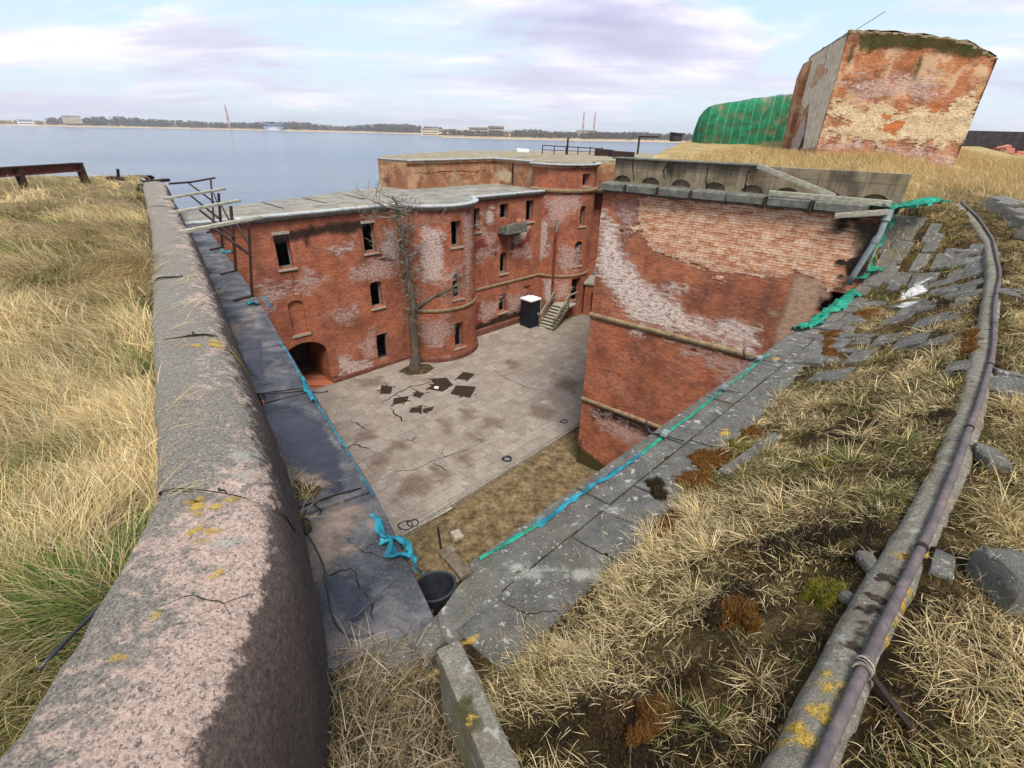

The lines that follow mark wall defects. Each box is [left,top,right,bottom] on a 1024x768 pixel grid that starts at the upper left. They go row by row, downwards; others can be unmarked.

spalling [877,113,907,147]
damp [274,220,366,243]
spalling [629,196,879,299]
damp [833,217,880,264]
damp [596,203,763,383]
crack [381,381,434,442]
crack [348,421,487,471]
crack [158,487,267,507]
crack [315,537,382,619]
crack [161,593,251,618]